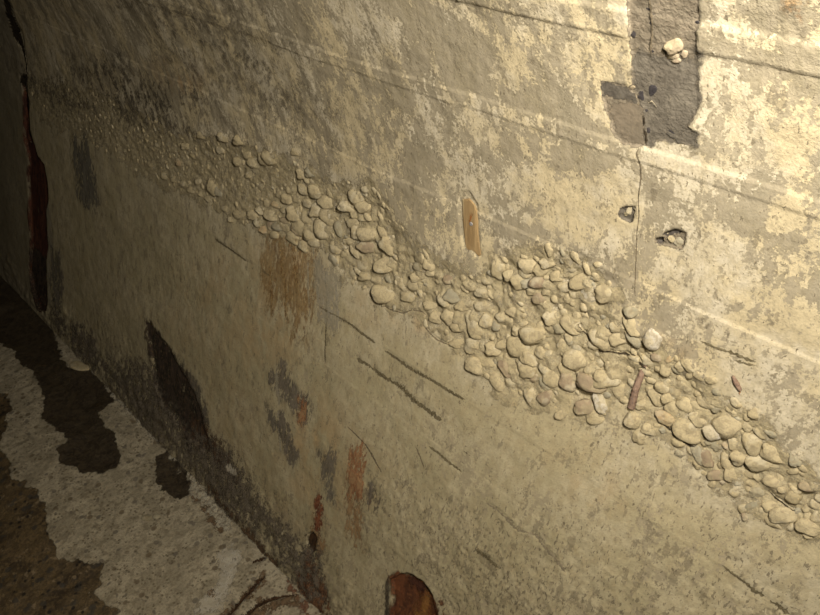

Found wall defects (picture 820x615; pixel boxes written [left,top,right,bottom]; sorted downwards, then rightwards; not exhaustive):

corrosion [22,86,64,312]
corrosion [261,238,342,338]
crack [634,149,642,289]
water stain [51,303,328,615]
corrosion [384,571,444,615]